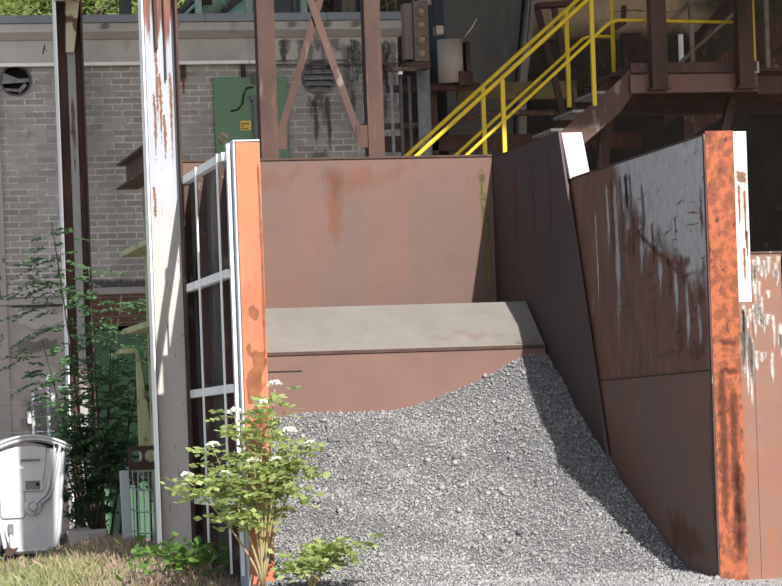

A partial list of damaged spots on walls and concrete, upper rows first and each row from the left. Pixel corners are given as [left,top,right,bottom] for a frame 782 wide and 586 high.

rust [152,52,185,161]
leakage [312,97,332,141]
leakage [347,40,364,124]
leakage [381,41,391,116]
leakage [479,171,491,295]
peeling [606,136,707,344]
rust [736,171,749,281]
peeling [15,308,64,330]
rust [246,164,270,482]
peeling [740,256,782,402]
rust [719,368,744,553]